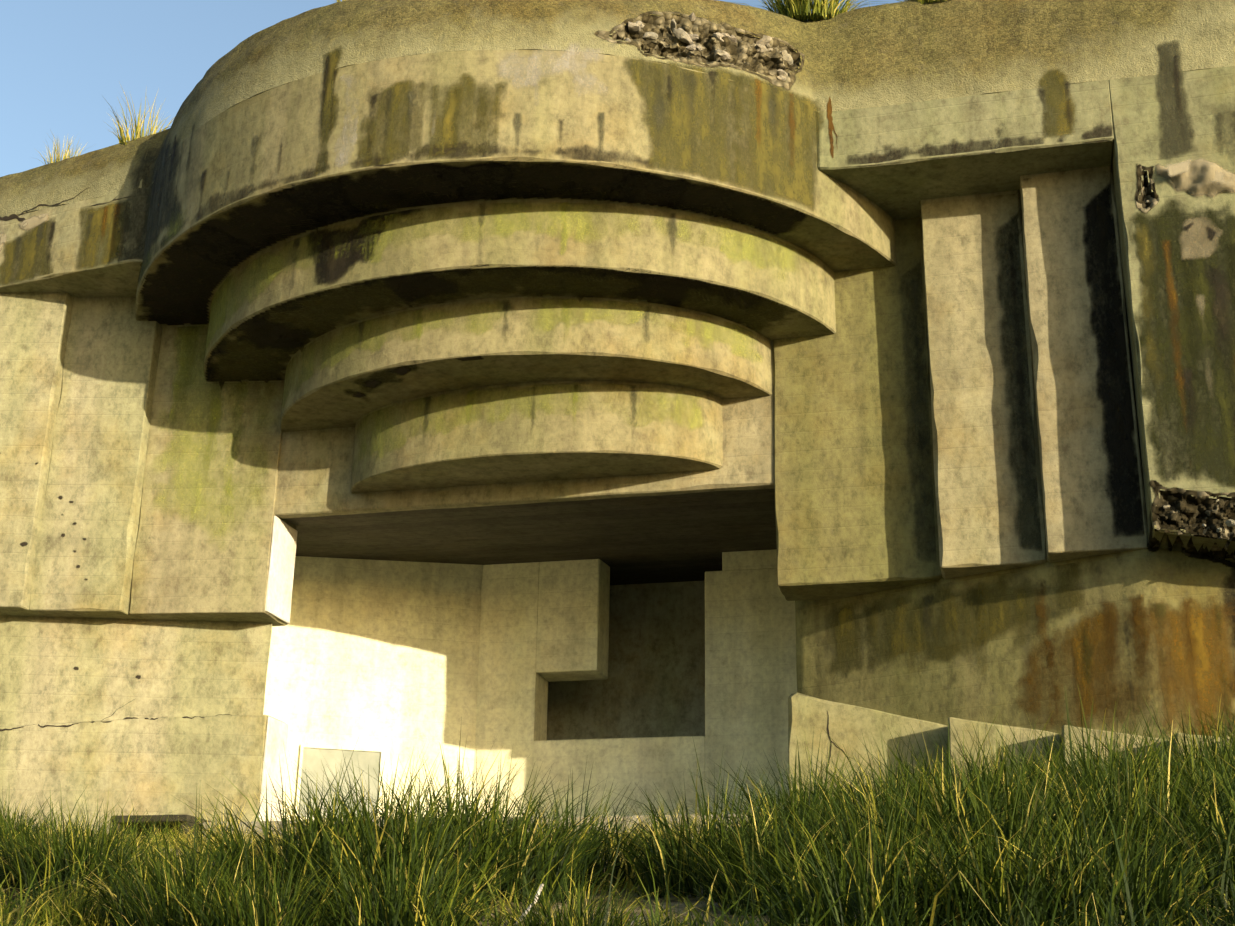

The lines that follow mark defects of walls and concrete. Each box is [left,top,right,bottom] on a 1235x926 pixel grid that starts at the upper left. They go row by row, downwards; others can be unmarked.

spalling [595,11,805,90]
damp [1157,42,1194,158]
crack [0,188,131,221]
damp [77,49,823,430]
spalling [1135,164,1159,213]
damp [1137,226,1198,422]
spalling [1147,480,1235,567]
rust [1020,596,1235,737]
crack [0,700,230,731]